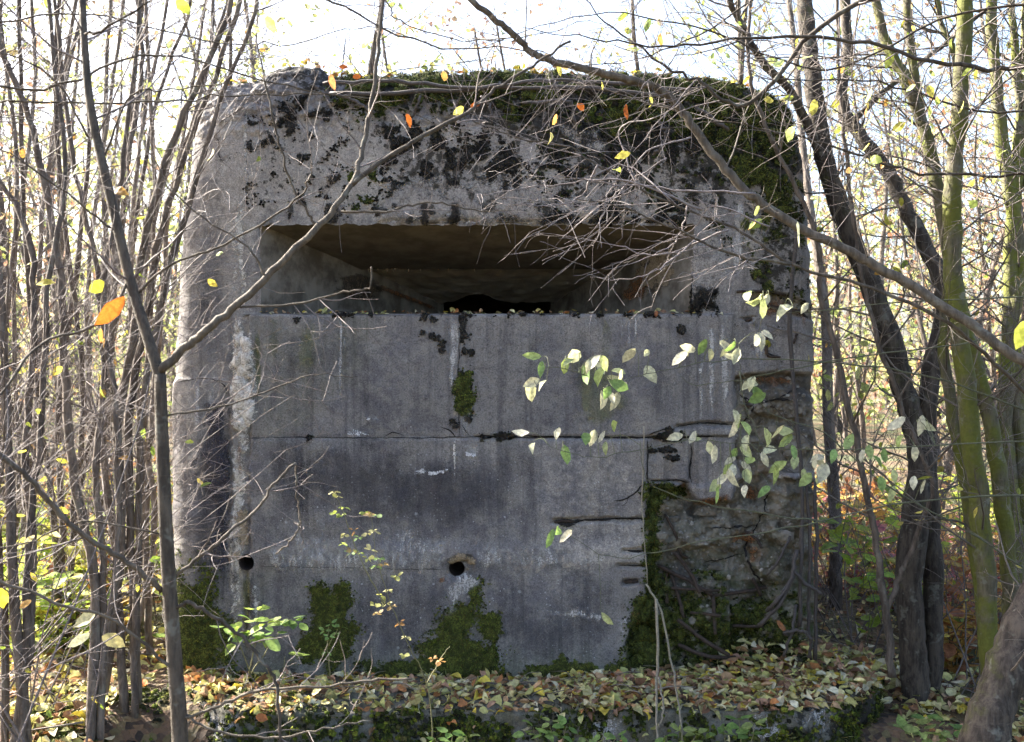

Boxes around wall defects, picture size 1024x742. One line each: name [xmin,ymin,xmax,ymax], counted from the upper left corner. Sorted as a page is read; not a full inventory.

damp [231,321,256,386]
damp [228,411,259,626]
crack [254,322,798,569]
spalling [624,373,814,671]